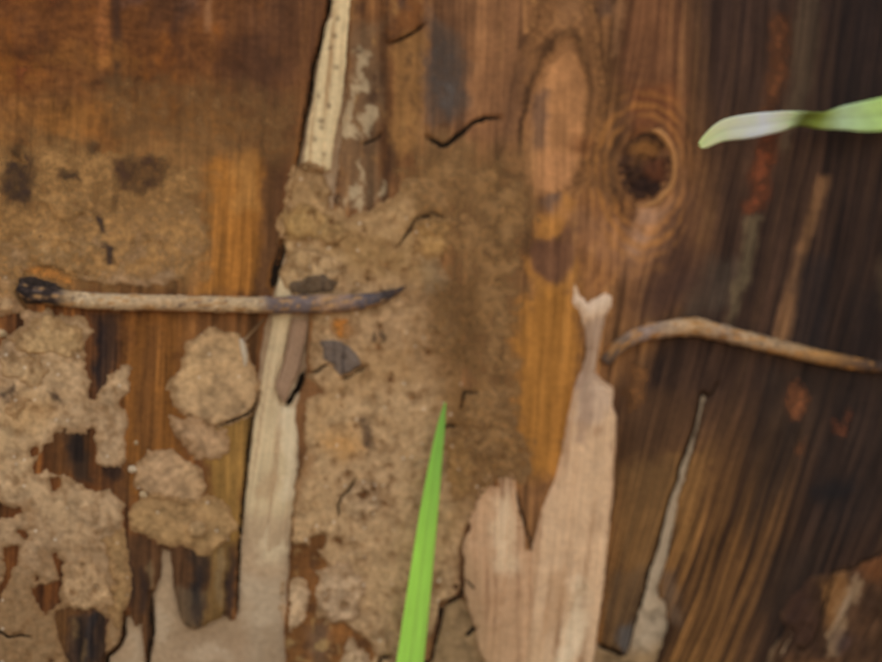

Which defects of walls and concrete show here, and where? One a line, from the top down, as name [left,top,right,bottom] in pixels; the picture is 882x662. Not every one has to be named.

crack [389,24,425,44]
crack [297,0,332,168]
crack [426,116,501,148]
crack [270,243,286,288]
peeling [278,202,350,281]
peeling [0,313,85,420]
peeling [338,480,385,525]
crack [599,384,717,656]
peeling [61,555,114,612]
peeling [314,560,367,623]
peeling [767,555,882,662]
peeling [340,637,370,662]